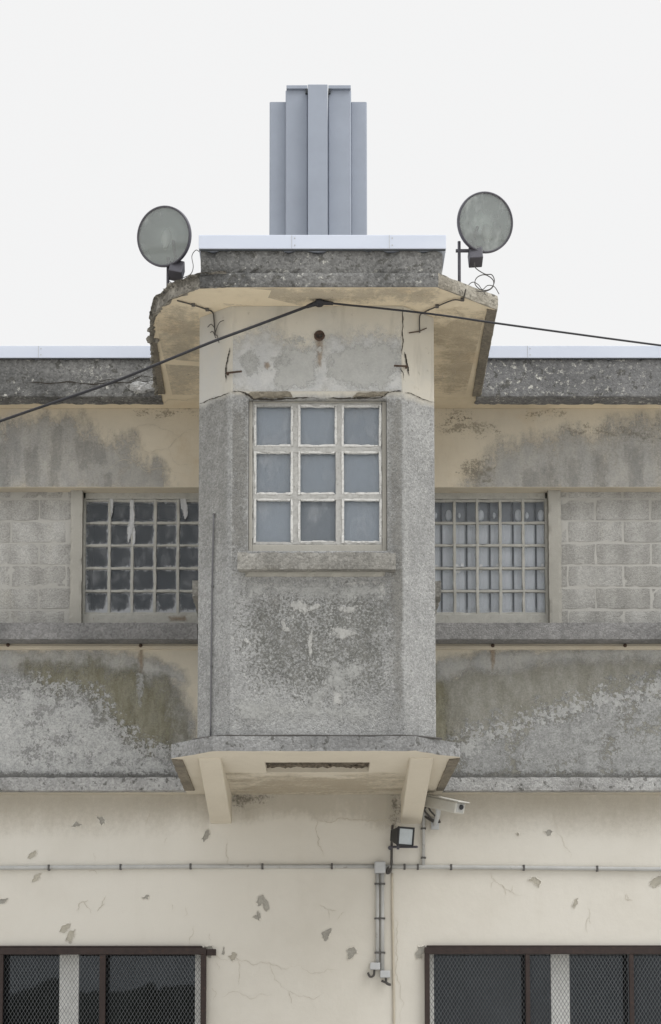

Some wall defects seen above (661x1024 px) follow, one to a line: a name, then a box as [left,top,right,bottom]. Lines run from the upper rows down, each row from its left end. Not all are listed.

spalling [125,271,229,396]
peeling [233,327,402,401]
crack [388,312,430,402]
leakage [0,415,165,516]
leakage [466,414,661,487]
leakage [0,650,194,778]
peeling [59,922,76,944]
peeling [252,894,269,922]
peeling [345,946,358,960]